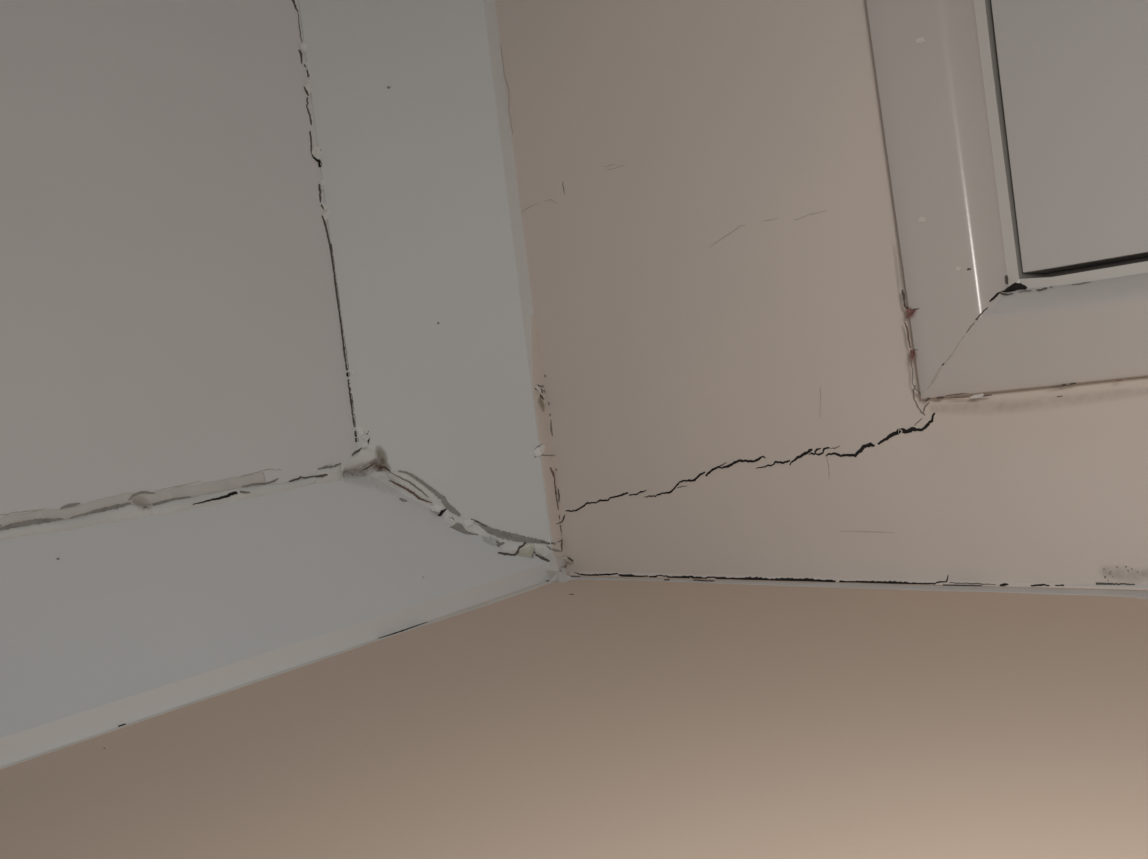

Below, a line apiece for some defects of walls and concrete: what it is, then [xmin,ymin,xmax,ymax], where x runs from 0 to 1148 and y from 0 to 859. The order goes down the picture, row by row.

crack [0,0,370,531]
peeling [450,523,479,535]
crack [389,243,1064,587]
crack [1096,579,1135,587]